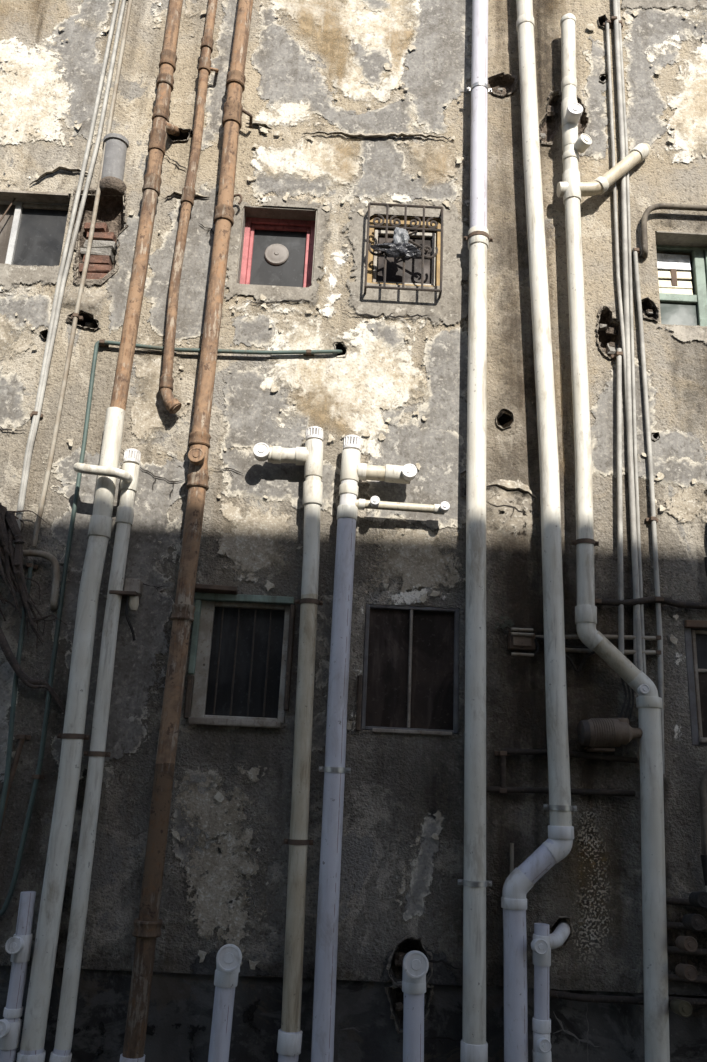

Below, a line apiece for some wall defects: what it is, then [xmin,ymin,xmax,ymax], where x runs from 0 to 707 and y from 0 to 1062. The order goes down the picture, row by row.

peeling [0,0,115,146]
crack [29,164,94,185]
peeling [65,187,140,333]
peeling [127,182,219,441]
crack [246,120,272,132]
peeling [247,0,472,216]
crack [302,128,450,143]
peeling [216,244,468,605]
peeling [79,460,123,780]
peeling [102,451,190,790]
damp [563,586,611,686]
damp [570,746,627,966]